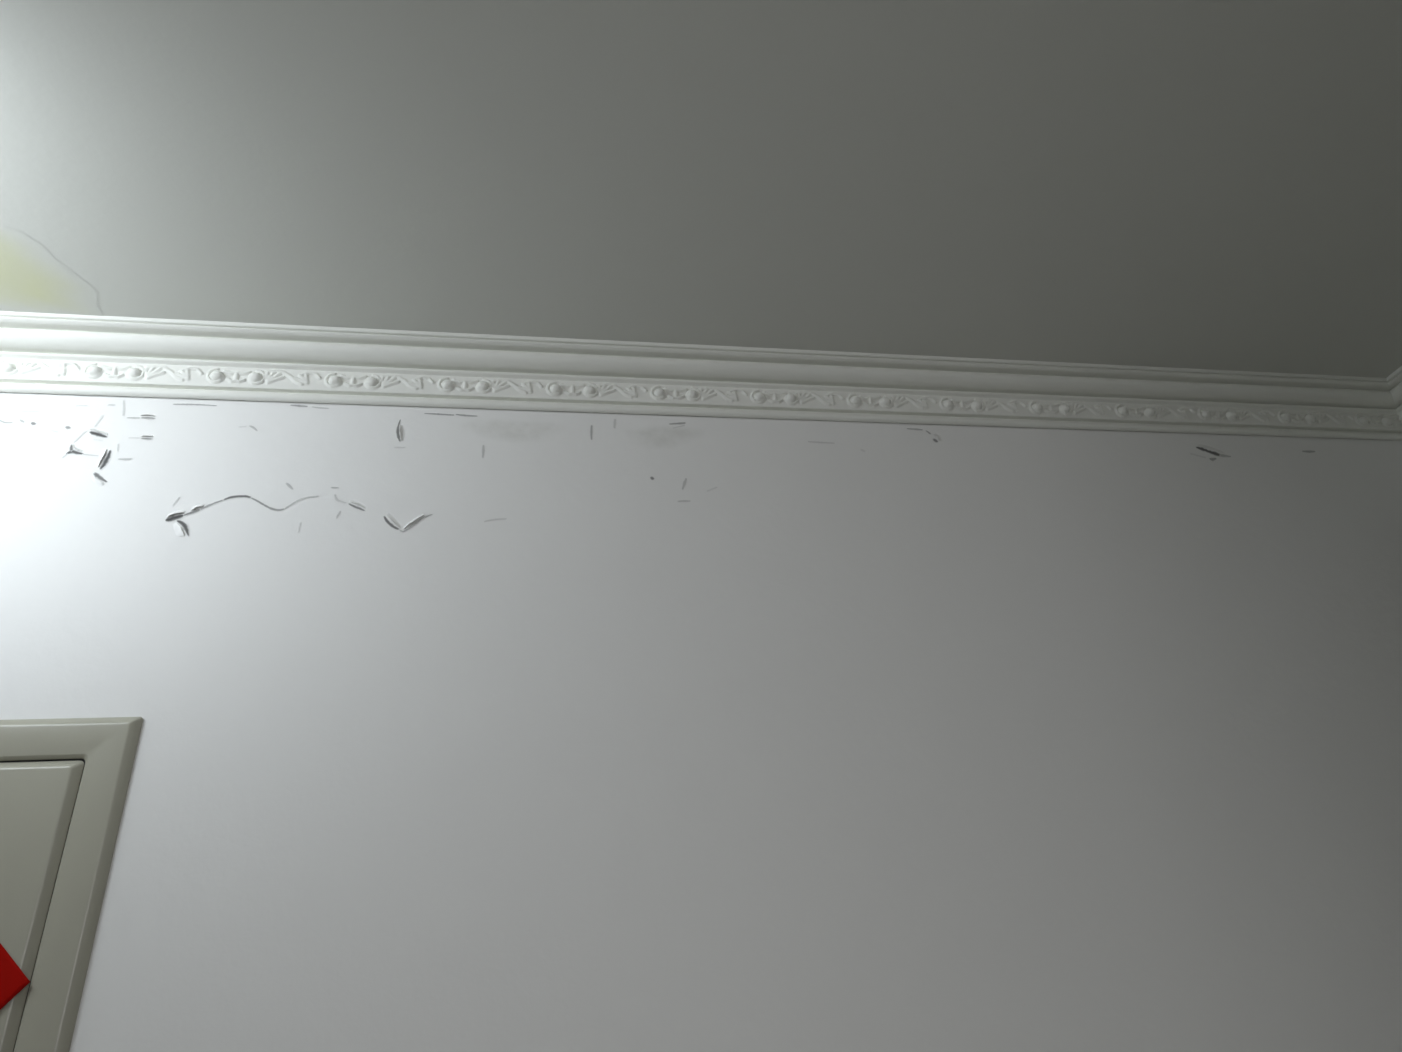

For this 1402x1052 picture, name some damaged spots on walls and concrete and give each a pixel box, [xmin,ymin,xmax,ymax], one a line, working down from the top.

crack [165,482,433,537]